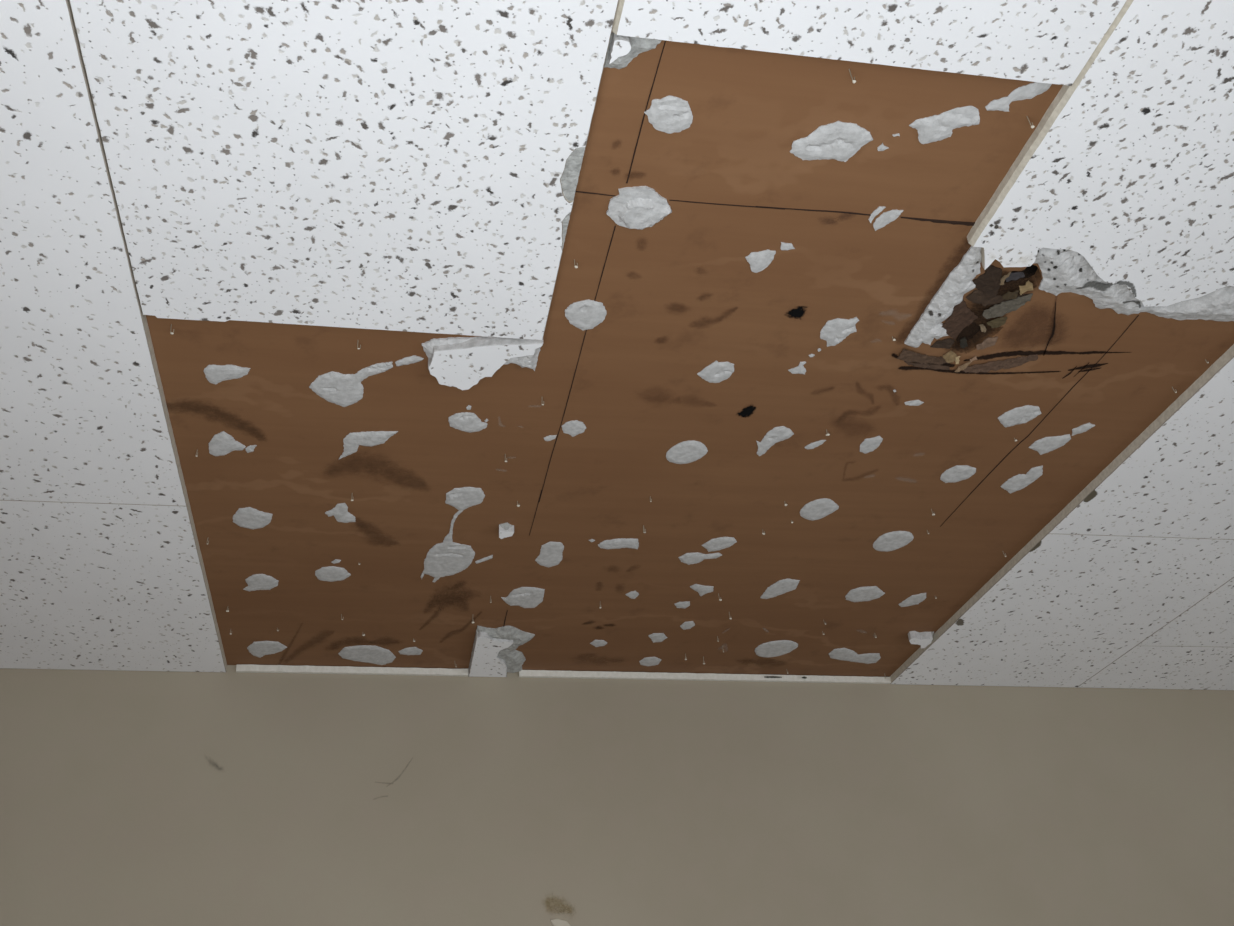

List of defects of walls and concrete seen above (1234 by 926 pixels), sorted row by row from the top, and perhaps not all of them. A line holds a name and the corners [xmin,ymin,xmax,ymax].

spalling [561,147,585,250]
peeling [395,355,424,366]
peeling [897,265,1033,372]
crack [892,302,1139,527]
peeling [1072,422,1095,436]